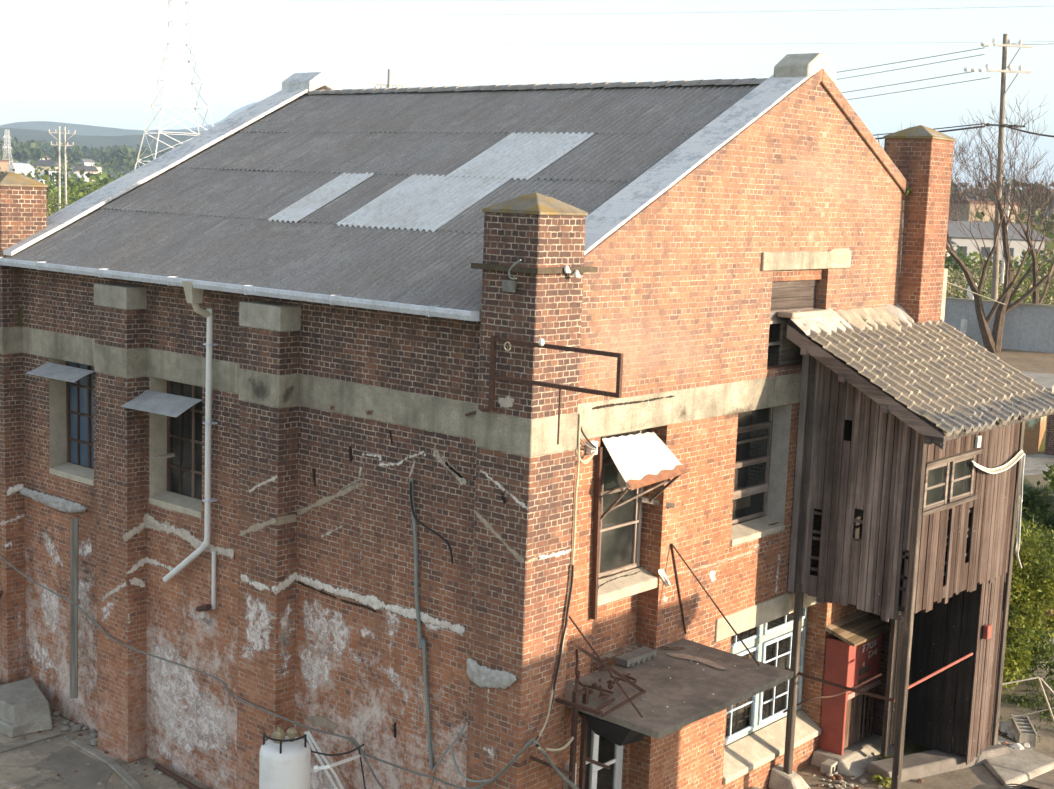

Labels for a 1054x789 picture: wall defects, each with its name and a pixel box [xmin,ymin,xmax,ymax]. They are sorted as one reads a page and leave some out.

efflorescence [43,532,63,566]
efflorescence [41,584,59,633]
efflorescence [78,580,91,601]
crack [298,582,423,623]
efflorescence [17,616,57,671]
efflorescence [242,593,374,689]
efflorescence [130,640,227,776]